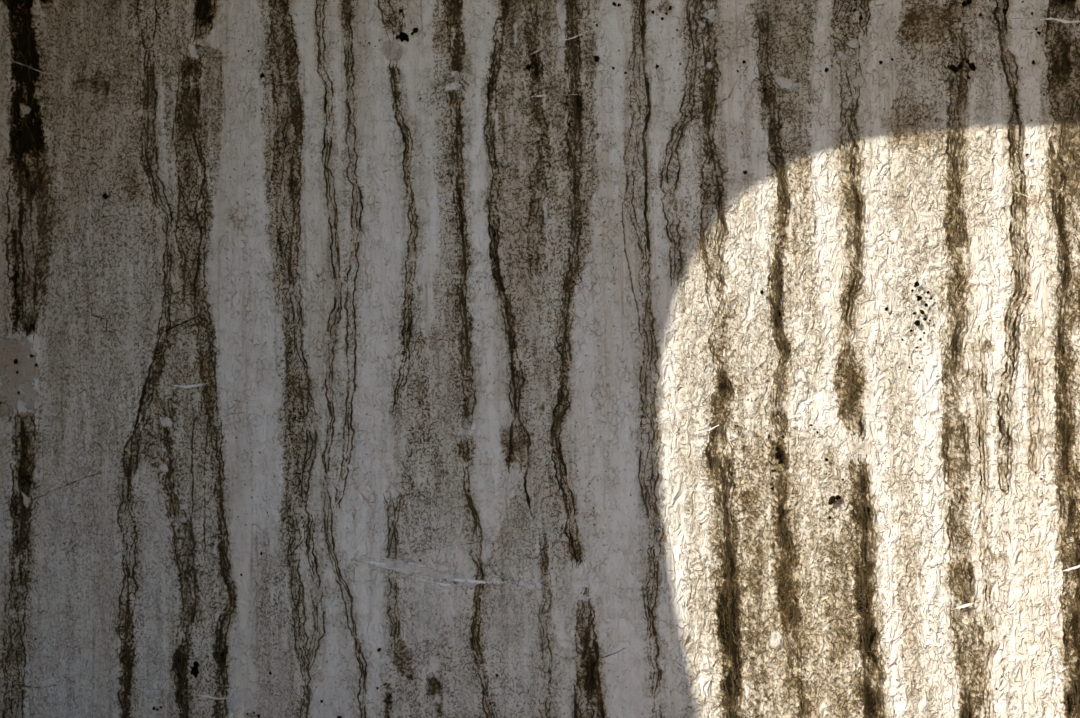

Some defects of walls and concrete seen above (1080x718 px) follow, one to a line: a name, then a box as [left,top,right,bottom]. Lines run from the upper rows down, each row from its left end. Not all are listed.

damp [1,0,260,718]
damp [255,0,392,718]
damp [342,0,418,228]
damp [386,497,402,565]
damp [387,579,412,678]
damp [389,0,477,426]
damp [427,677,442,713]
damp [458,441,483,663]
damp [483,0,600,569]
damp [571,589,605,718]
damp [612,0,890,718]
damp [879,0,1080,718]